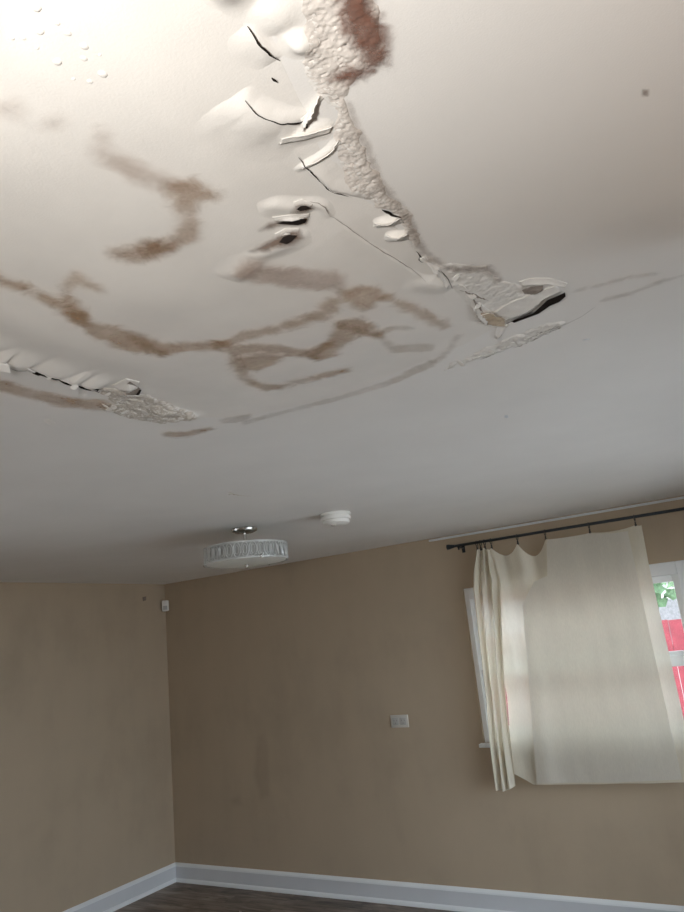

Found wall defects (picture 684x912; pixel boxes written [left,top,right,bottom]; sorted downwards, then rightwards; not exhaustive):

damp [259,233,300,250]
peeling [444,321,565,371]
peeling [96,388,197,424]